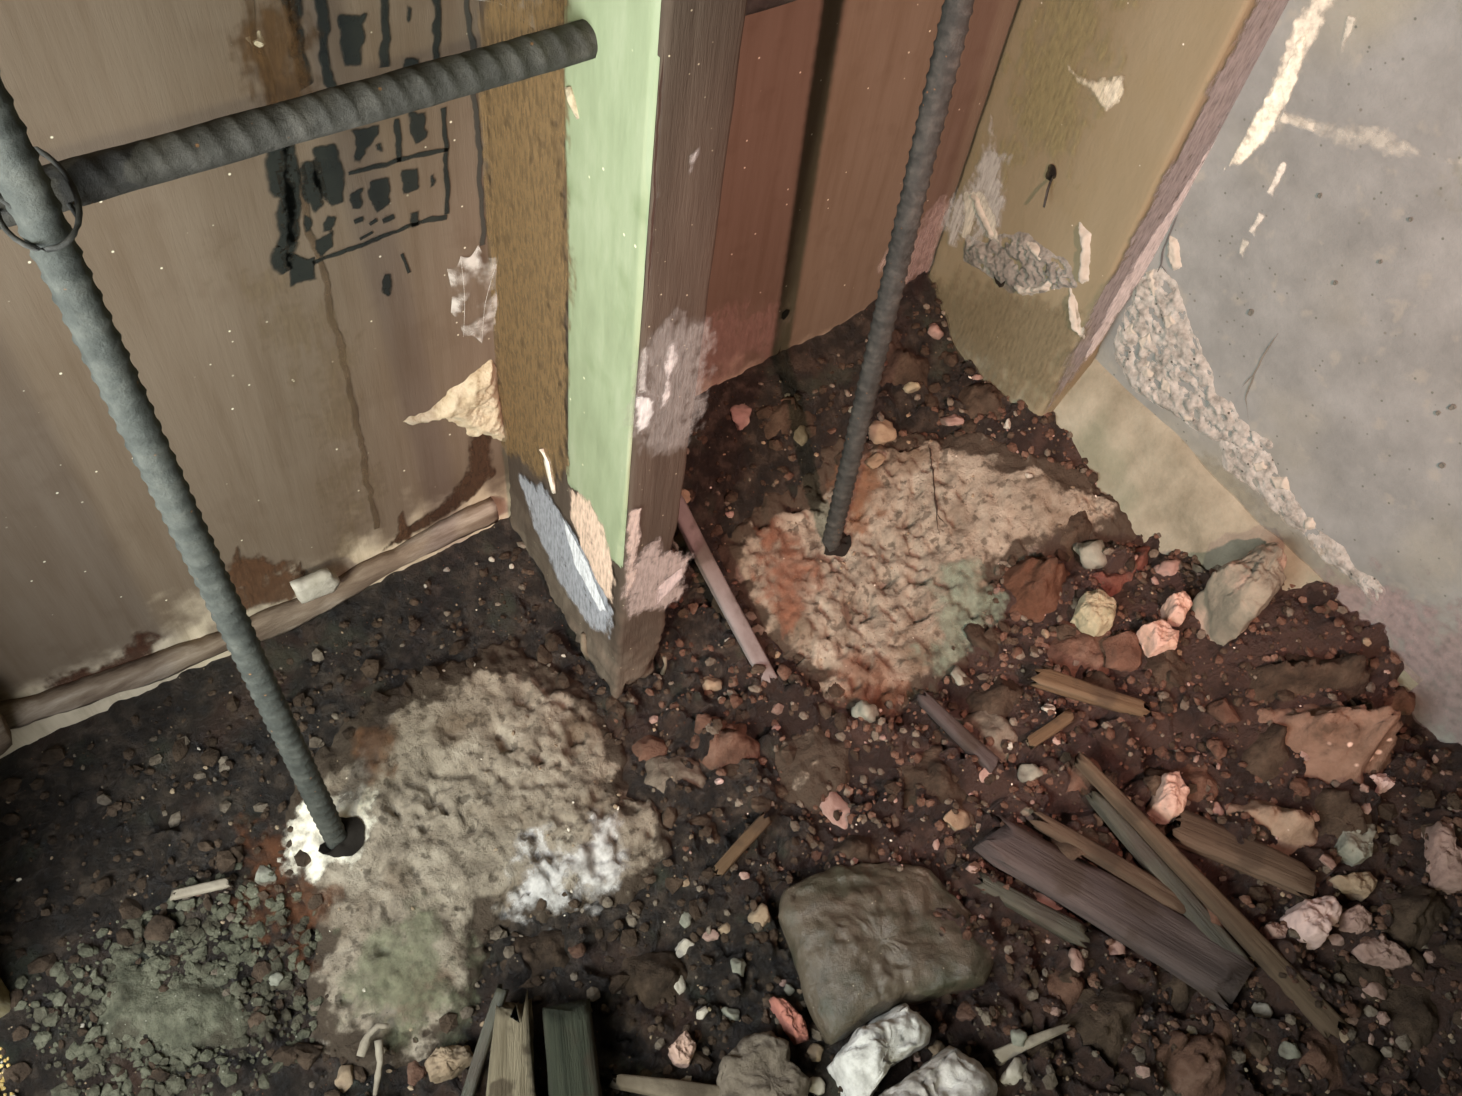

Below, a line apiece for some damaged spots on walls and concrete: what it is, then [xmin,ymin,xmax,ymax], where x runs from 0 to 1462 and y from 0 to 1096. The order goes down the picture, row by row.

spalling [745,0,796,16]
spalling [0,19,598,850]
spalling [963,190,1092,339]
spalling [1114,236,1386,607]